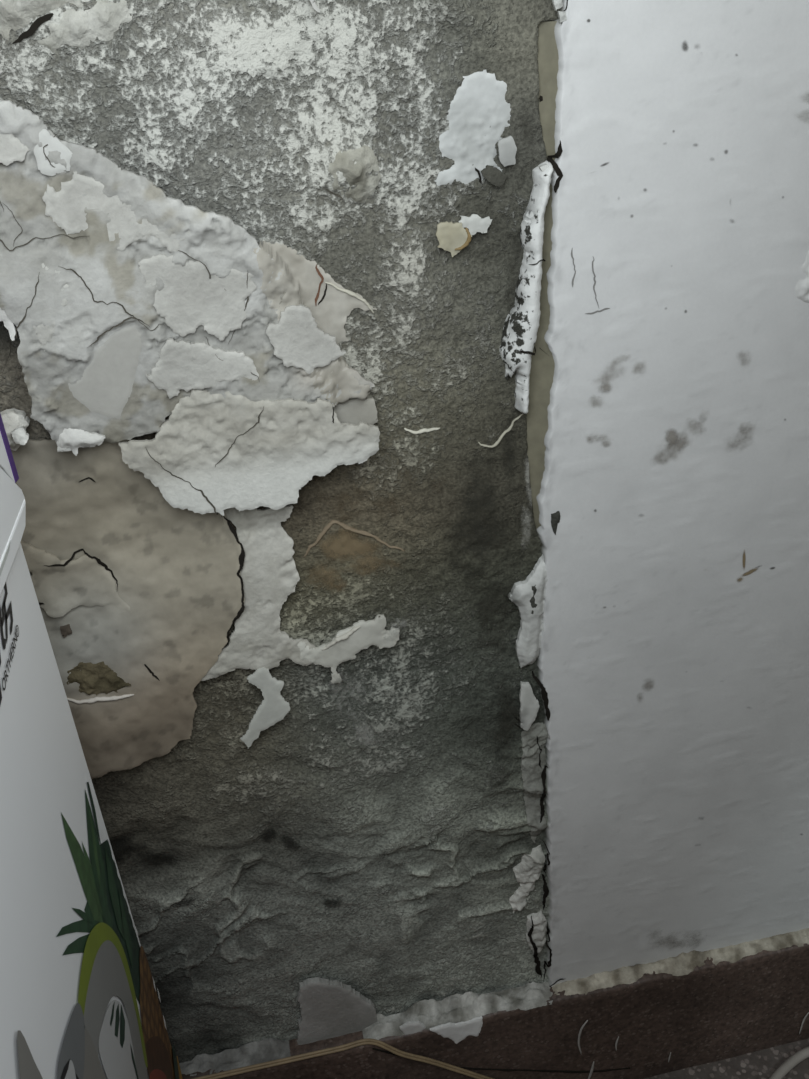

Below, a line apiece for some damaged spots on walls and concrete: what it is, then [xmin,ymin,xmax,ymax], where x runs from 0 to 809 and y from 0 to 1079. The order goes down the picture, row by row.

peeling [0,0,133,53]
peeling [498,136,517,167]
peeling [436,214,492,257]
crack [519,0,610,529]
peeling [0,99,400,748]
spalling [551,511,560,535]
spalling [508,554,564,987]
peeling [399,1016,483,1044]